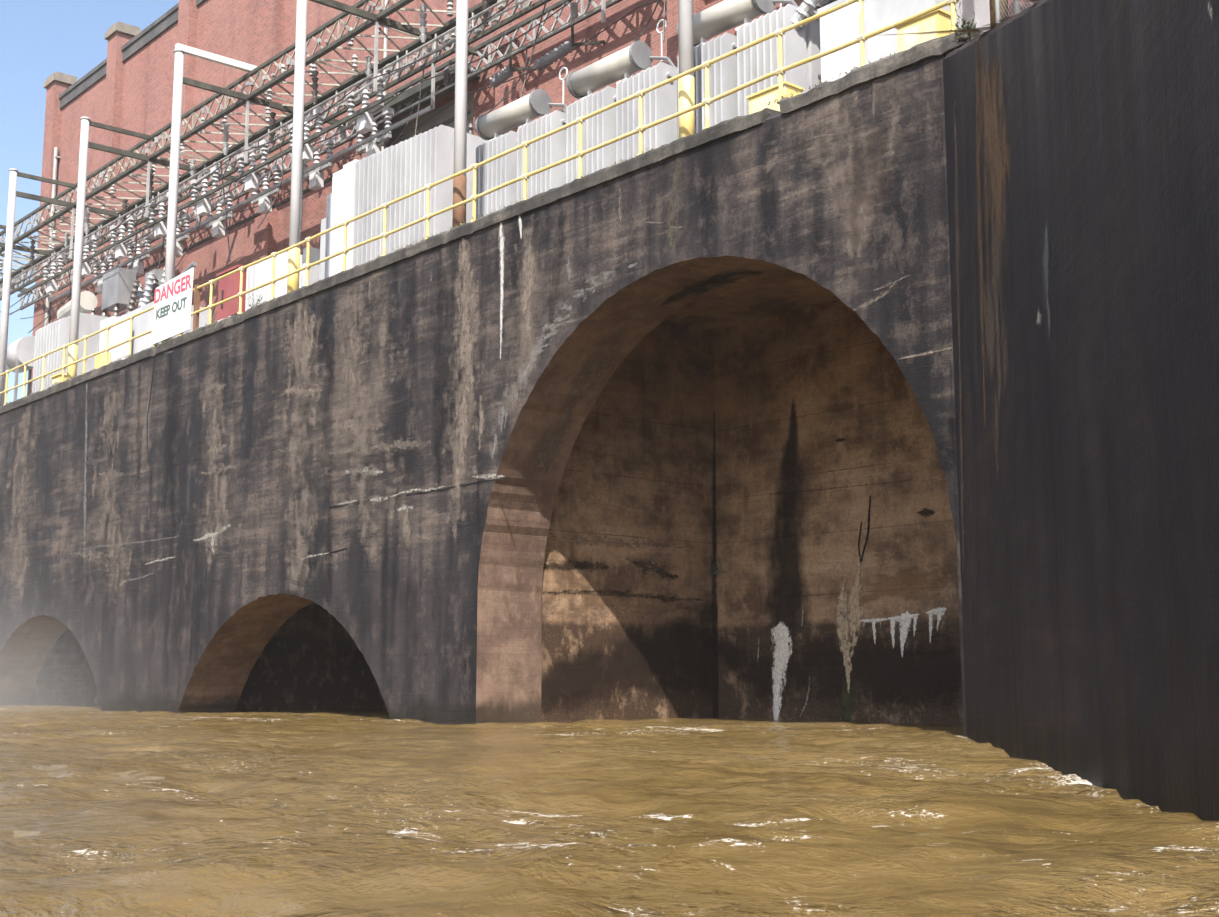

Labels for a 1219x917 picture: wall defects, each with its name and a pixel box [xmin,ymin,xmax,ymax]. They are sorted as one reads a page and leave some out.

leakage [541,403,961,720]